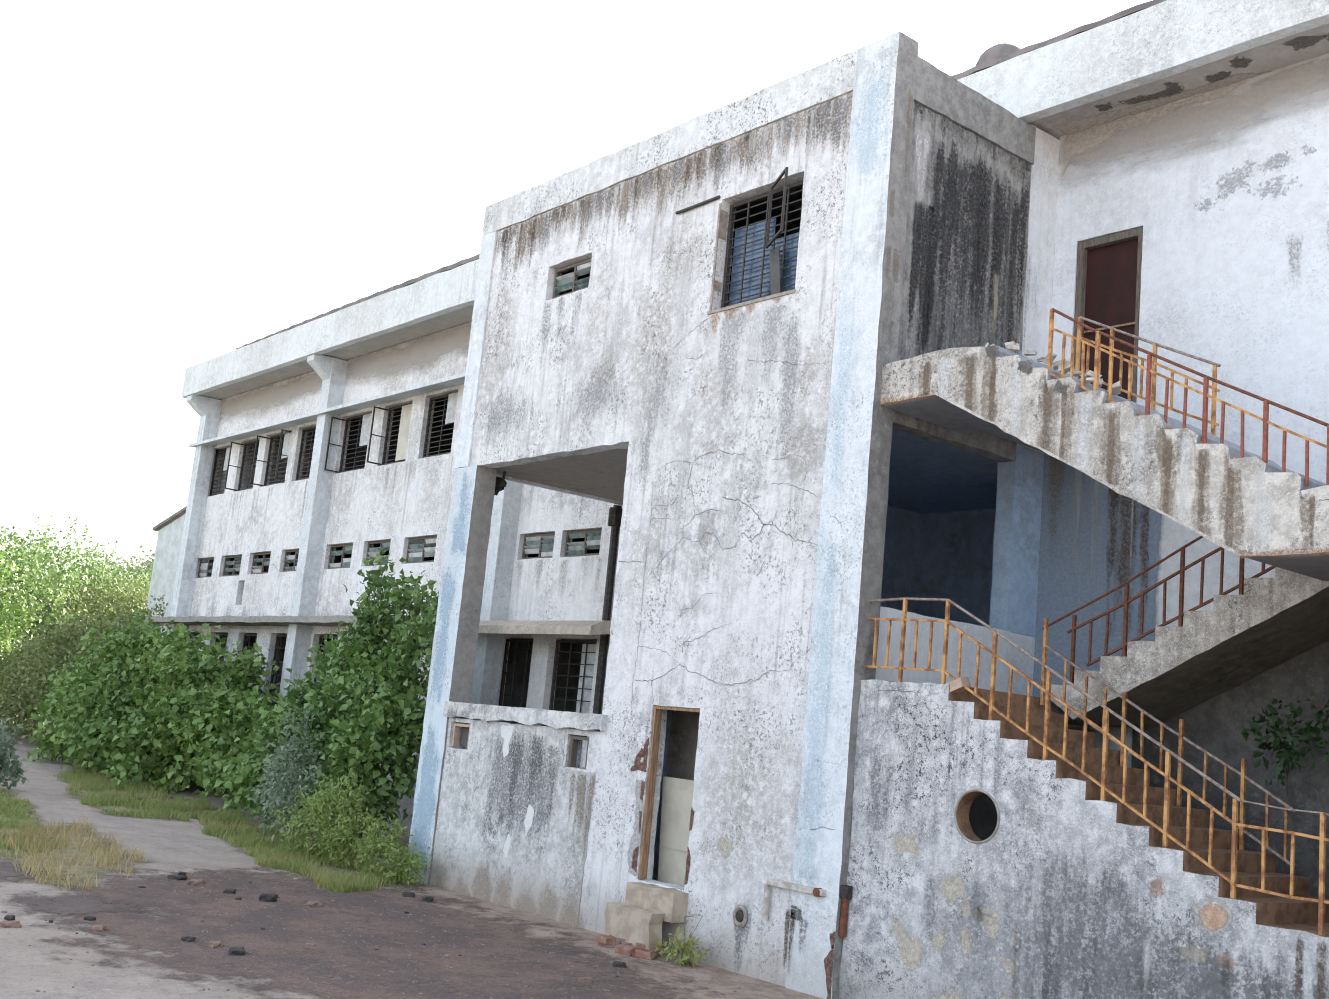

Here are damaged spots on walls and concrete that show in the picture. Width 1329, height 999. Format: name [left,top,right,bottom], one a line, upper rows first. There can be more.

spalling [1094,82,1184,111]
spalling [1203,56,1252,83]
spalling [1283,35,1329,51]
damp [496,91,853,268]
spalling [1200,145,1317,211]
damp [886,91,1036,434]
damp [1038,376,1273,640]
crack [619,449,844,739]
damp [485,736,559,829]
spalling [627,738,649,876]
rust [824,932,835,999]
damp [926,863,1327,999]